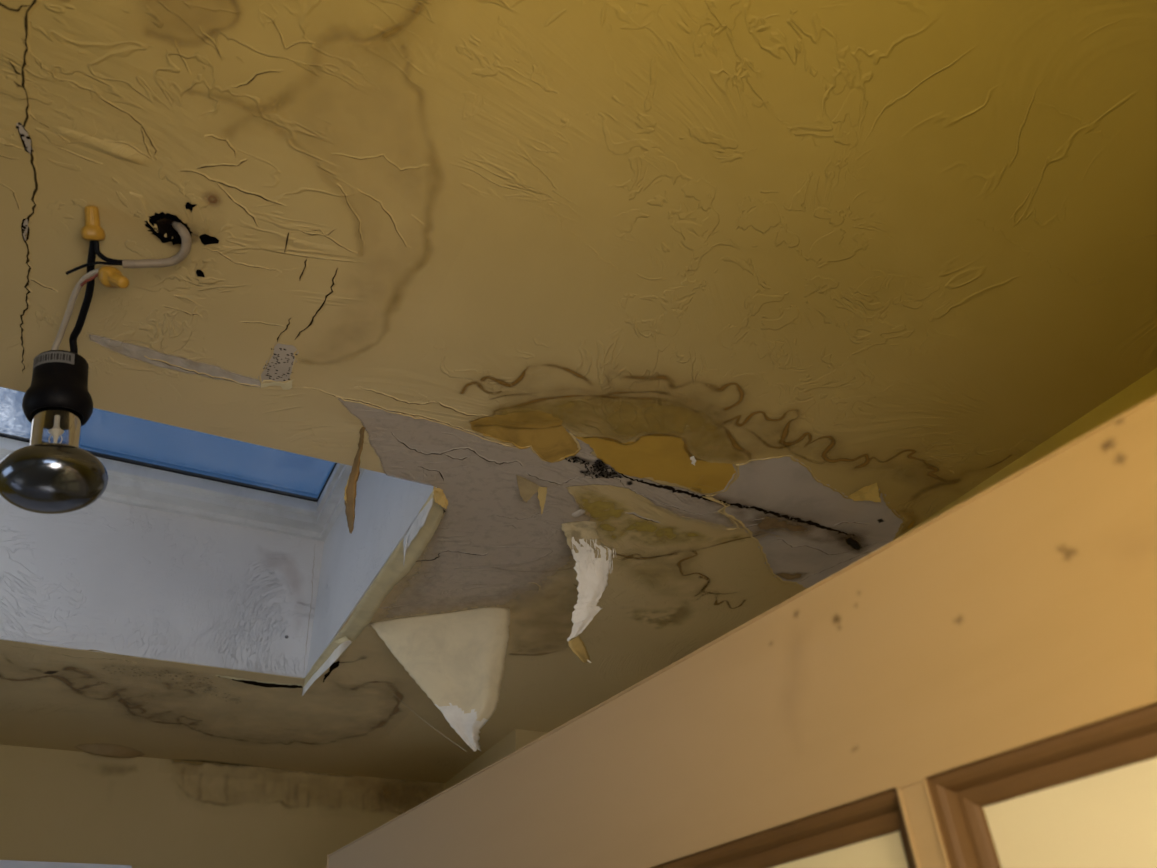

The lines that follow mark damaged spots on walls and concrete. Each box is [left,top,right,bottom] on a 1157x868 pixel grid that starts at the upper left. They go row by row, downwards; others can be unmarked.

crack [0,0,429,374]
peeling [90,335,299,390]
crack [303,386,579,485]
water stain [460,370,582,422]
water stain [565,456,632,485]
crack [619,473,855,536]
water stain [597,375,960,486]
crack [215,544,340,688]
peeling [302,396,906,752]
water stain [614,551,745,609]